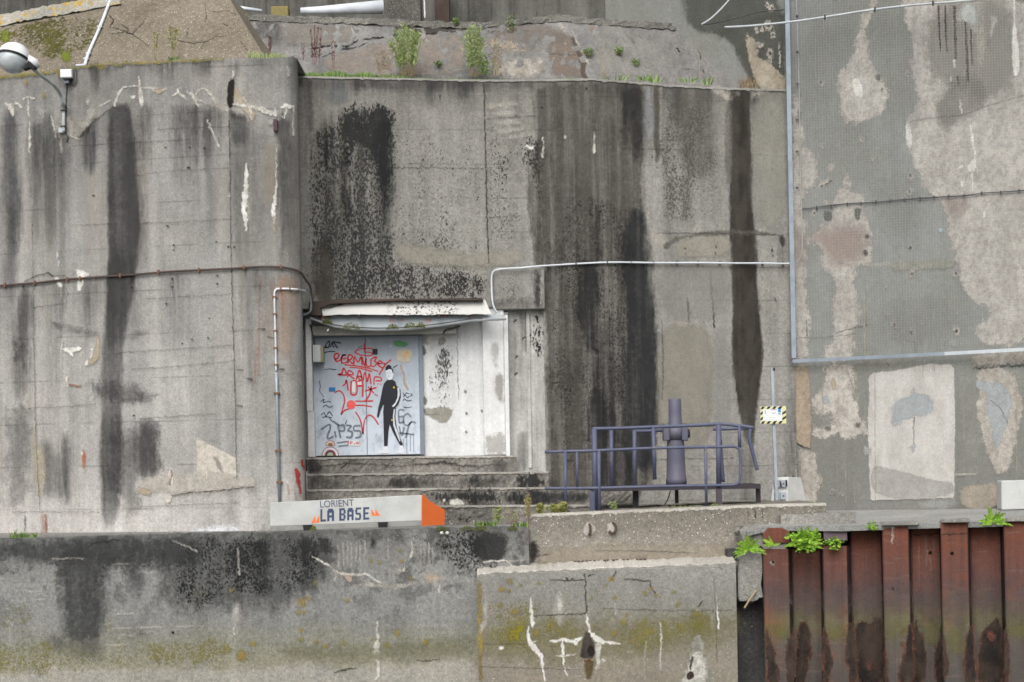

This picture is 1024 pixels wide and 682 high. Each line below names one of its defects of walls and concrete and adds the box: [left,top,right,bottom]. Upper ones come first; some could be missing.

peeling [837,0,889,125]
peeling [745,33,873,502]
peeling [899,0,1024,475]
leakage [0,27,785,639]
crack [535,571,656,617]
corrosion [764,617,949,682]
corrosion [962,617,1011,682]